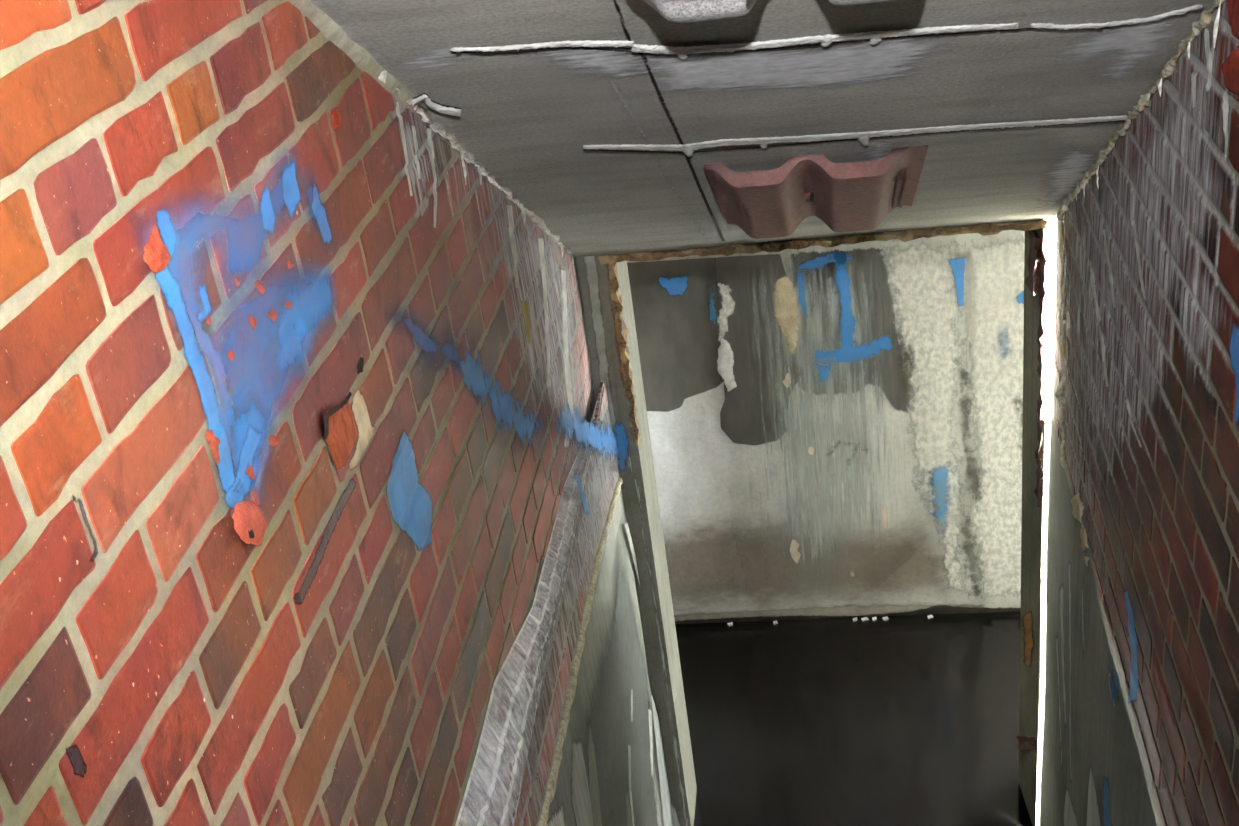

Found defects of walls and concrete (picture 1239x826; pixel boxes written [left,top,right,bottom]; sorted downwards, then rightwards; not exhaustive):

spalling [1221,0,1239,94]
damp [378,70,640,825]
damp [546,516,688,826]
peeling [717,283,735,341]
damp [627,240,1025,624]
damp [1071,492,1090,568]
damp [1043,0,1238,486]